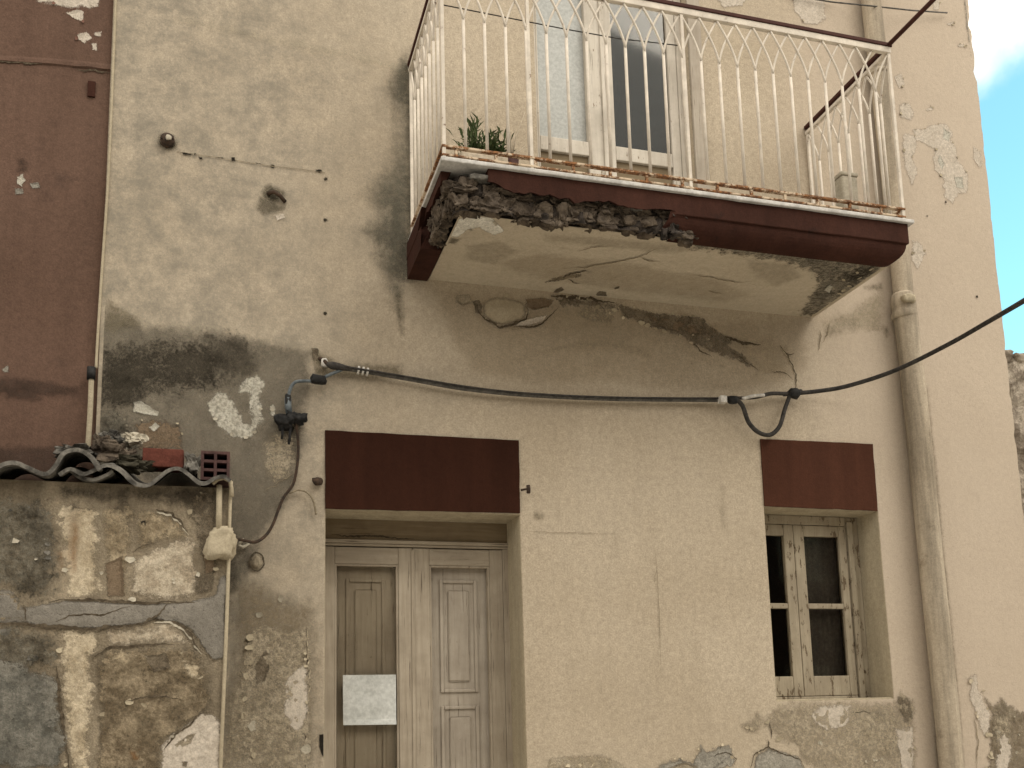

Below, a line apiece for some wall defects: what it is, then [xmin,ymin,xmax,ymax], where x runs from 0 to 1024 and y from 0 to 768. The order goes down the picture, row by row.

damp [376,65,411,290]
spalling [426,173,699,248]
crack [551,295,614,309]
damp [695,245,880,316]
flaking render [207,375,275,439]
flaking render [34,491,219,602]
damp [100,308,318,756]
crack [0,598,201,653]
spalling [56,612,323,768]
peeling [745,693,916,768]
spalling [969,674,1024,768]